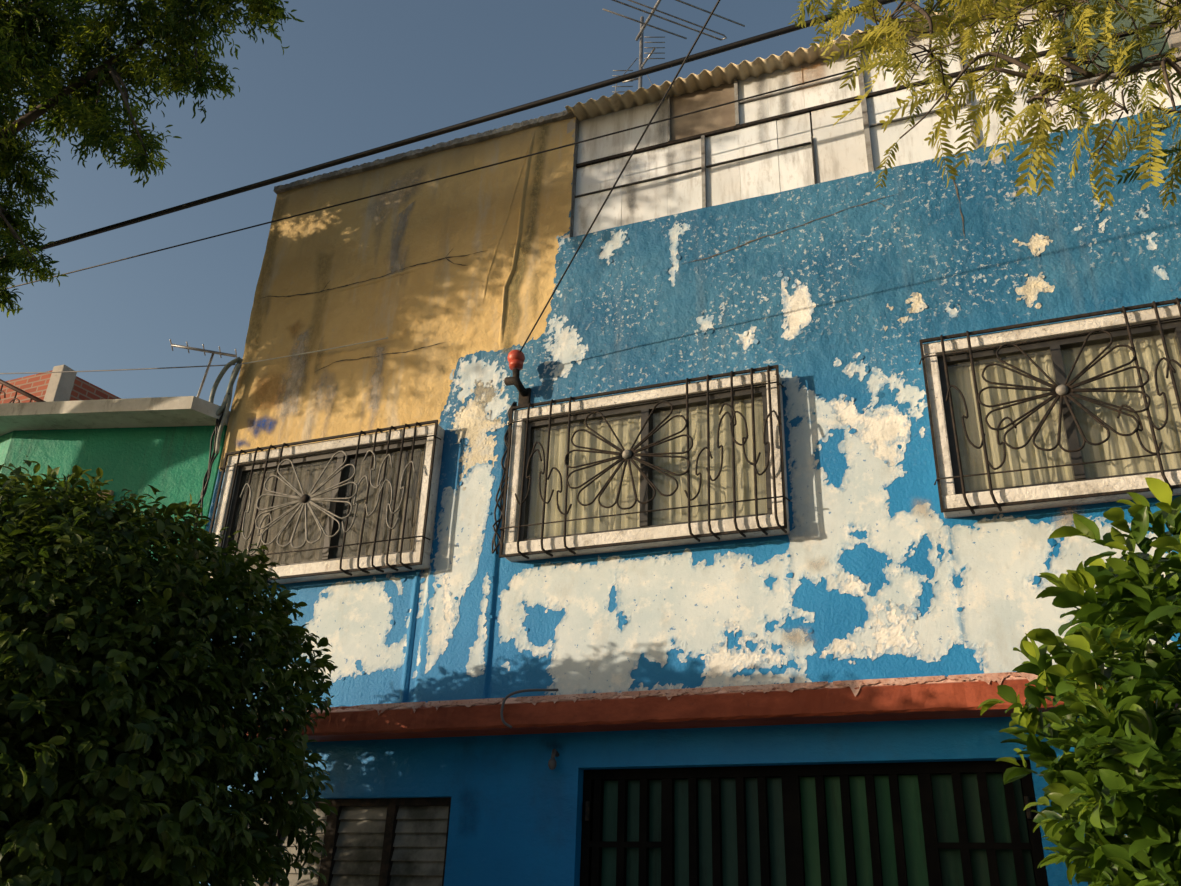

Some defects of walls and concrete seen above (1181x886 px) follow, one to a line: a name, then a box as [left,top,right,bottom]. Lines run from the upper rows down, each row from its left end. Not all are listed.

peeling [1012,233,1053,257]
peeling [761,271,816,341]
peeling [1015,272,1055,309]
peeling [736,326,758,350]
peeling [288,352,1172,716]